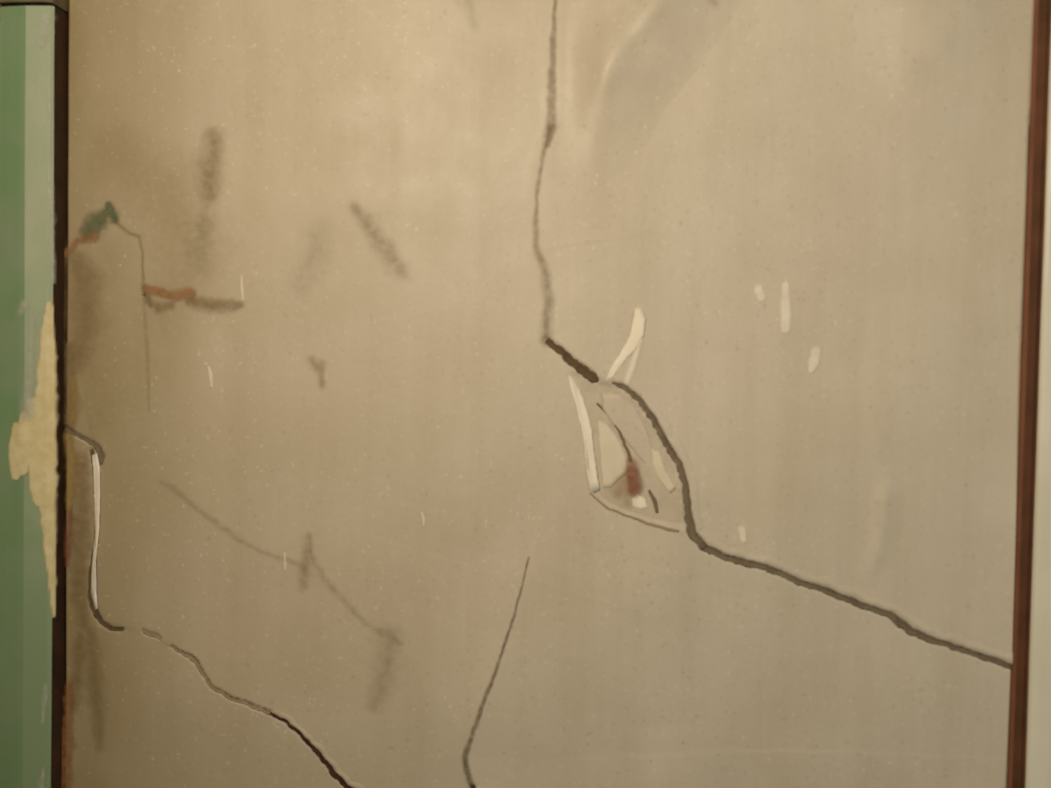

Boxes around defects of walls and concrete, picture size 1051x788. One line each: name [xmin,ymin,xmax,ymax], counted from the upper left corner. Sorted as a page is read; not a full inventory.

corrosion [143,286,214,307]
crack [64,426,365,788]
crack [464,559,529,788]
flaking render [569,308,683,532]
crack [545,338,1013,669]